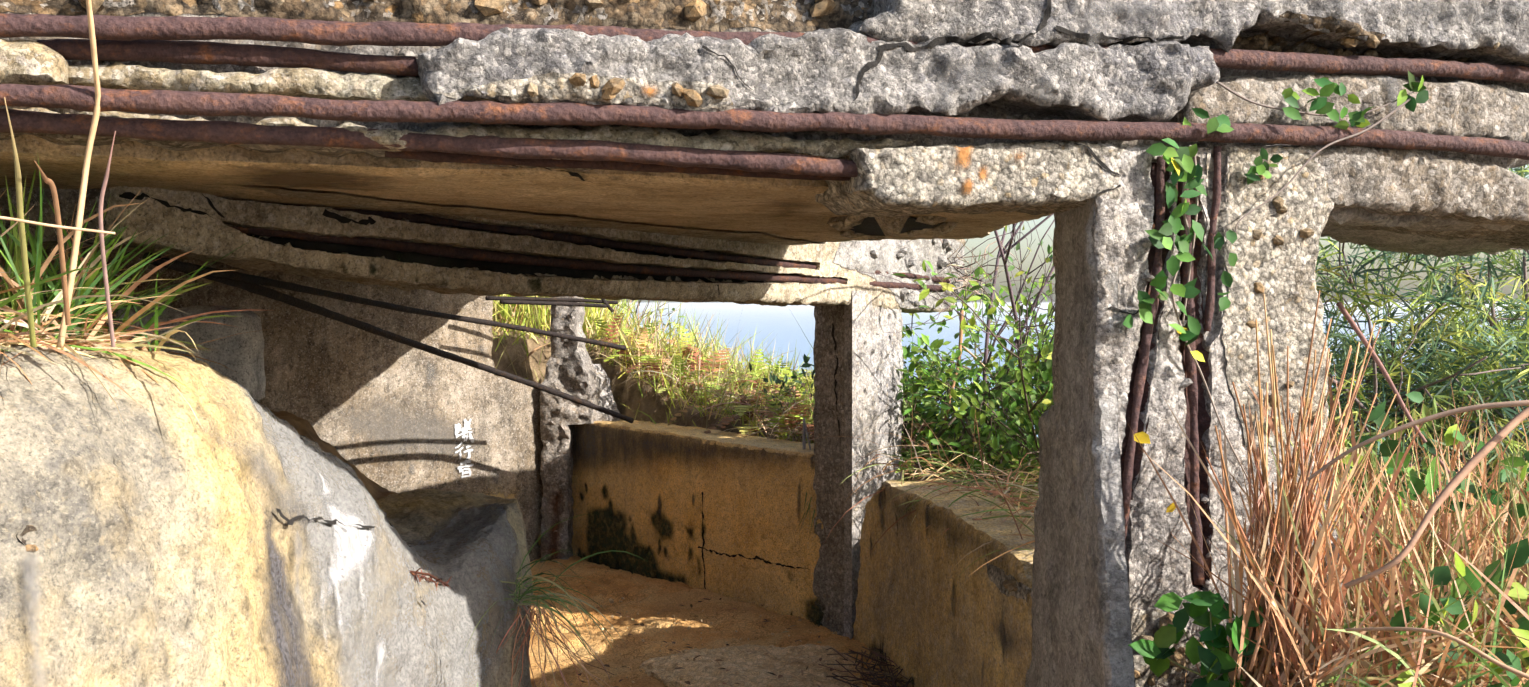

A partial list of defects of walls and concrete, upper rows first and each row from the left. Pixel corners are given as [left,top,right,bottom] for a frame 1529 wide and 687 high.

crack [855,0,1184,99]
spalling [1231,11,1385,58]
spalling [436,72,734,111]
rust [957,145,987,193]
damp [572,424,785,467]
damp [578,483,705,584]
crack [698,492,810,589]